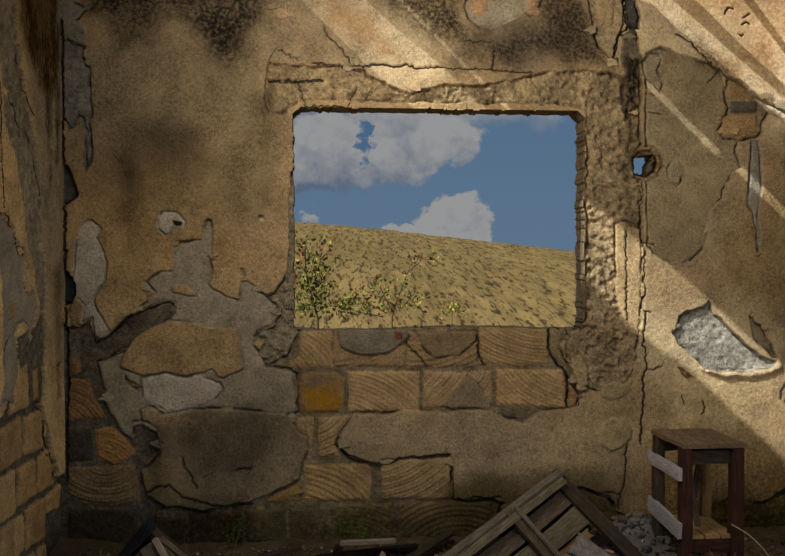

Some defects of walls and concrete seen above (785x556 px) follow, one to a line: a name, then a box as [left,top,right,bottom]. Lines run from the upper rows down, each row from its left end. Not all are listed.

flaking render [0,0,48,312]
leakage [101,0,264,54]
flaking render [0,171,581,556]
crack [263,25,533,112]
flaking render [464,0,545,30]
flaking render [264,46,785,393]
crack [577,179,662,515]